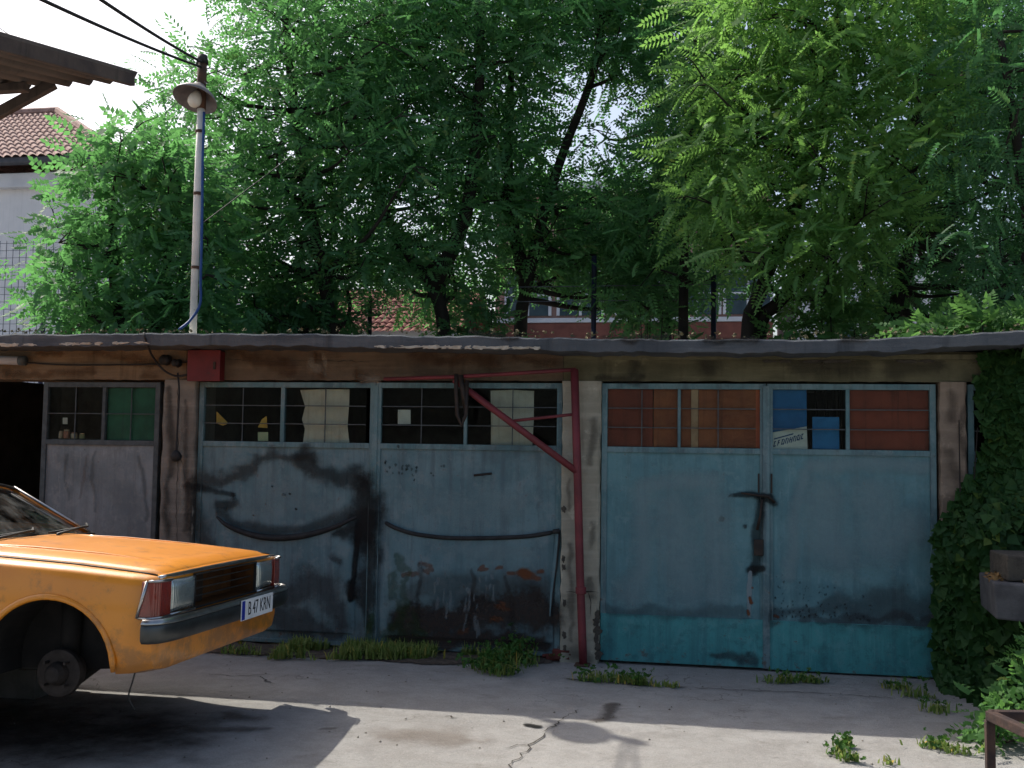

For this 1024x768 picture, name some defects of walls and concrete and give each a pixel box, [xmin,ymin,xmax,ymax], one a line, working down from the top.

rust [477,565,544,580]
crack [504,710,577,768]